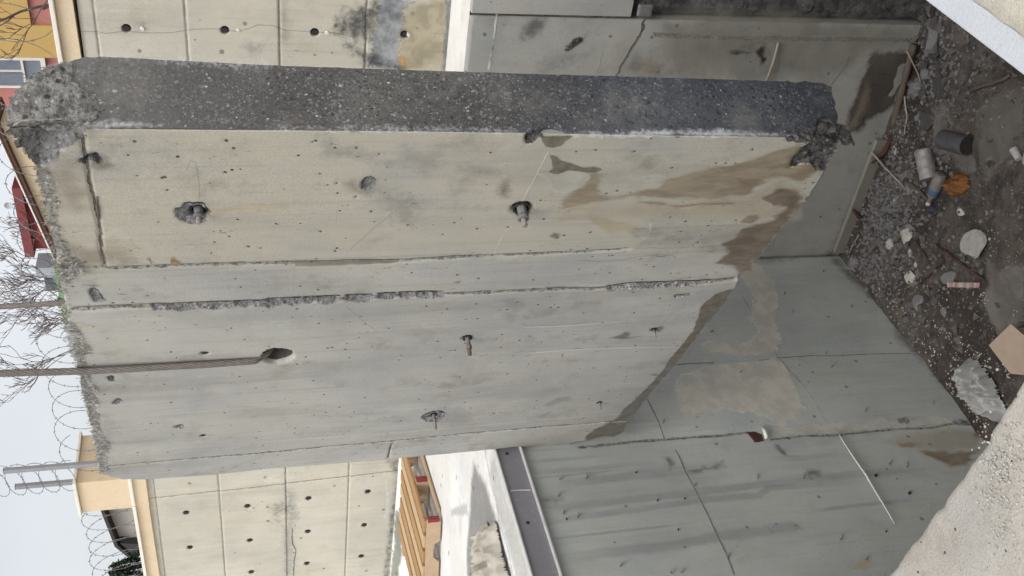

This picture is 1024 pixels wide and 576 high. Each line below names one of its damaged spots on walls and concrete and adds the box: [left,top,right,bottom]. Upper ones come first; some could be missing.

leakage [631,11,911,132]
efflorescence [617,129,776,138]
spalling [783,116,855,171]
spalling [0,62,121,474]
spalling [151,290,444,312]
leakage [541,135,981,467]